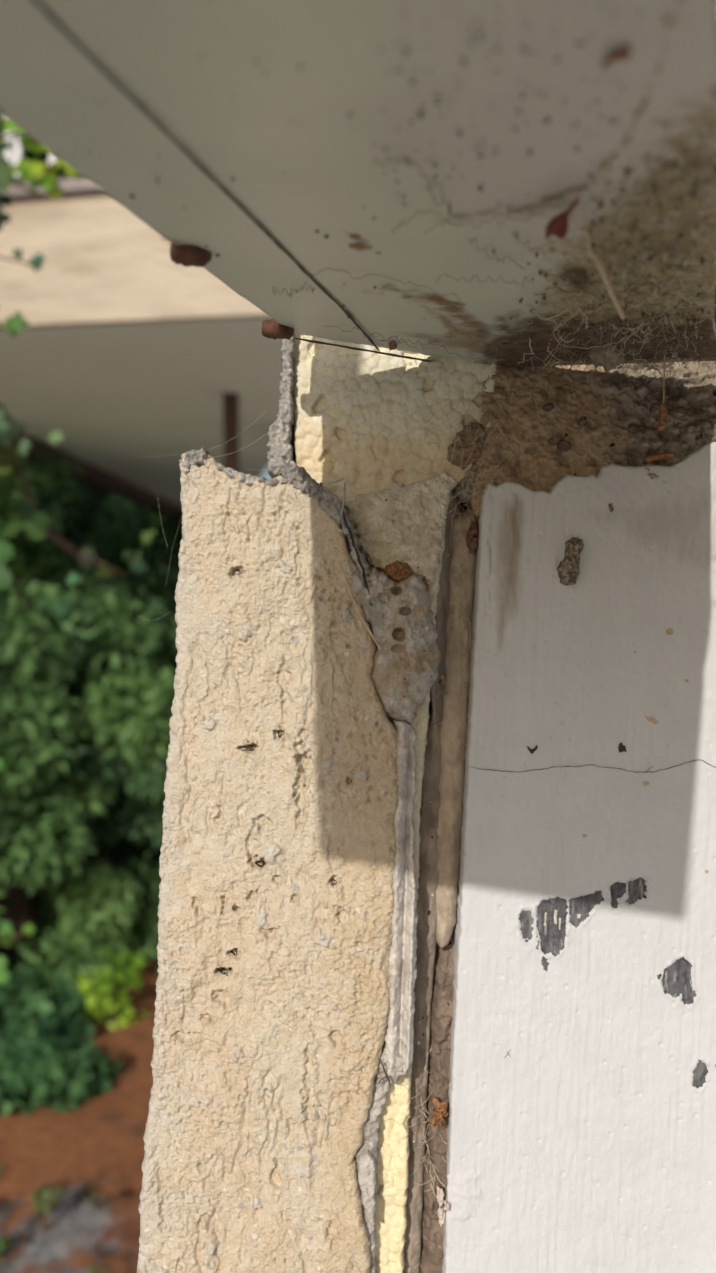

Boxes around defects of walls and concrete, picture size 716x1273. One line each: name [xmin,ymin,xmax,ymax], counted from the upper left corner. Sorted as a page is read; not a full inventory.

spalling [179,361,716,724]
peeling [519,877,647,971]
peeling [657,956,697,1005]
peeling [692,1060,708,1088]
flaking render [354,1046,413,1273]